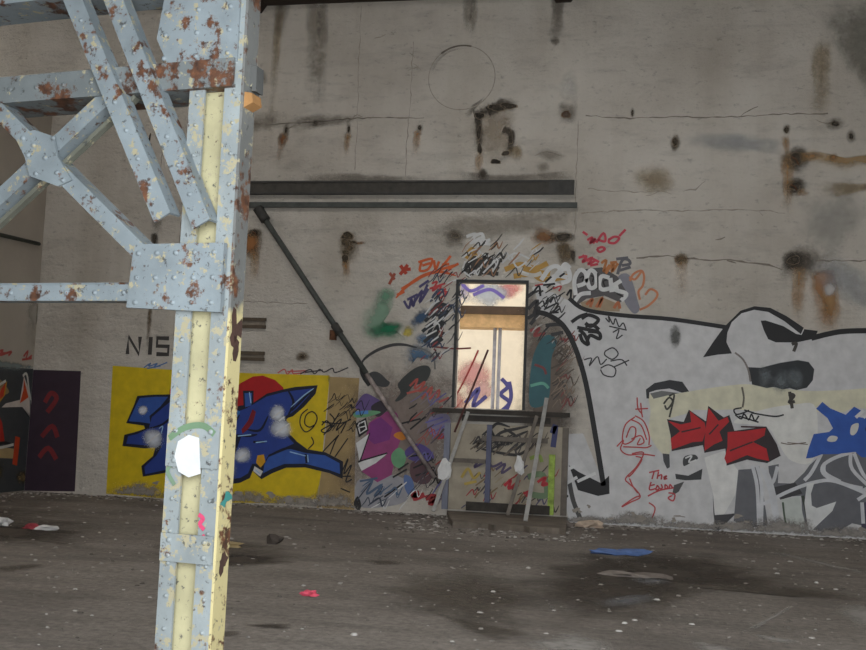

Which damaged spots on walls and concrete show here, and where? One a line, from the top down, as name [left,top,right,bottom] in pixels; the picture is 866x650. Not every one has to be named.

crack [535,106,833,243]
rust [804,154,866,165]
rust [835,184,866,193]
rust [795,271,837,318]
rust [230,307,242,361]
rust [219,552,228,577]